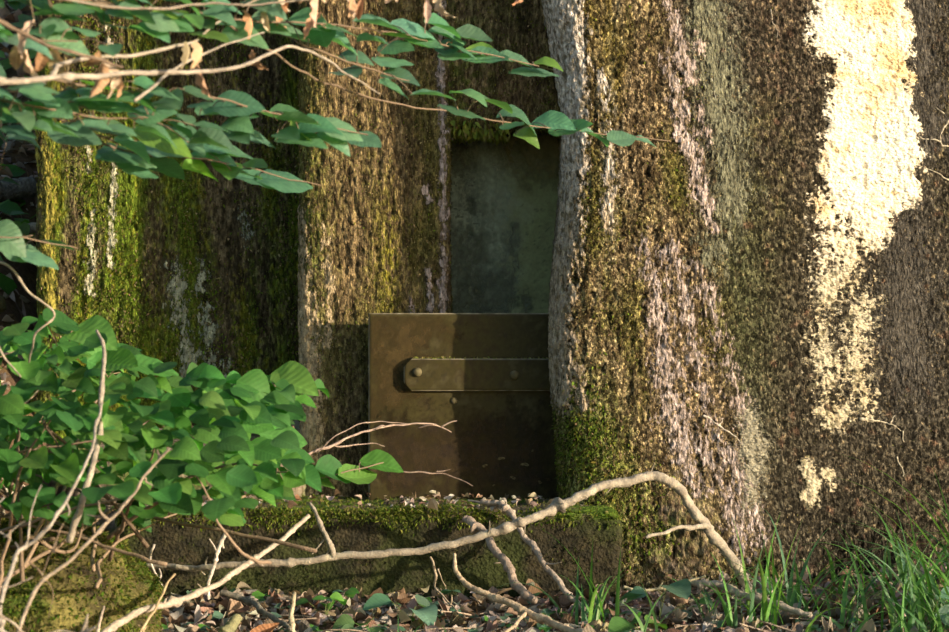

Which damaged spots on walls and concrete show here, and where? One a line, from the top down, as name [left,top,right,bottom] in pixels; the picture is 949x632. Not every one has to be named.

leakage [83,162,118,297]
leakage [160,255,232,378]